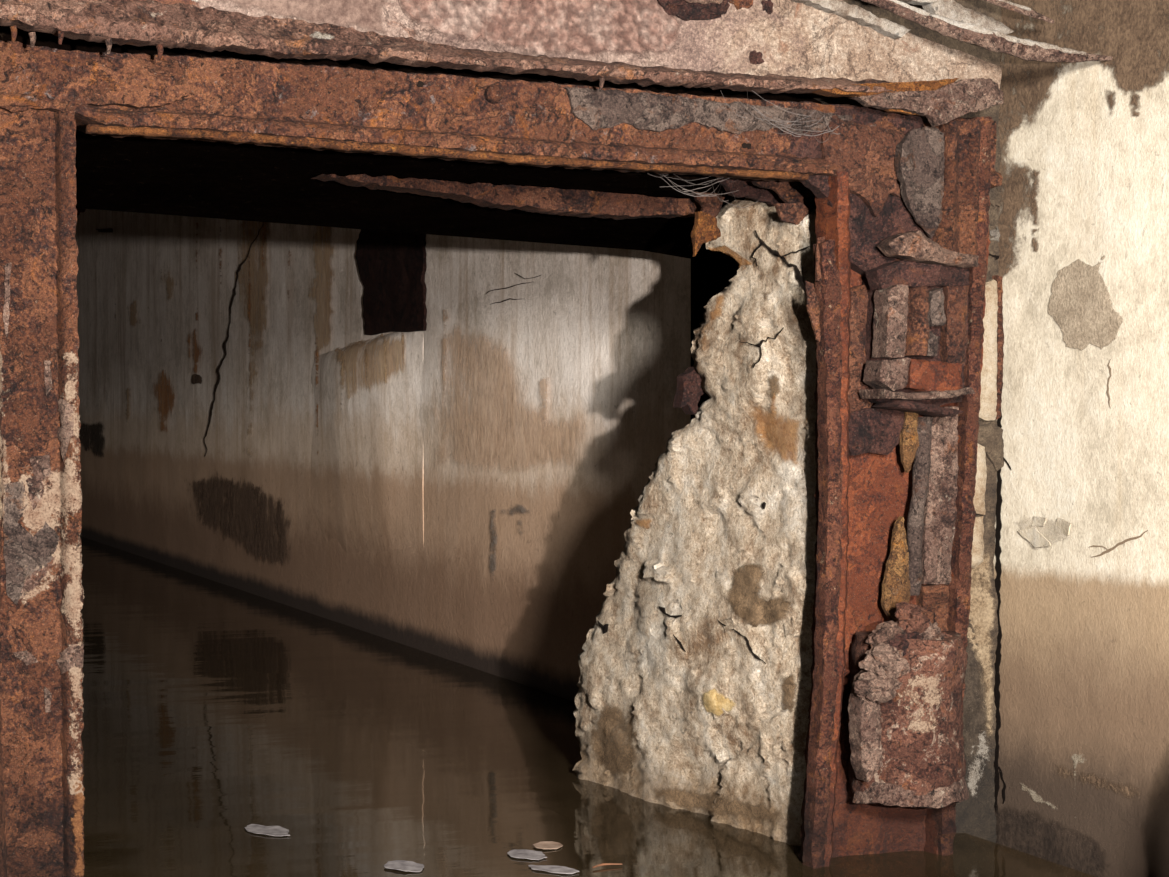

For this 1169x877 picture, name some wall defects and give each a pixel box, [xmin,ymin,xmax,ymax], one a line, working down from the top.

rust [10,26,36,48]
rust [311,174,814,268]
crack [204,224,264,457]
rust [235,221,269,394]
rust [310,226,404,398]
spalling [1048,256,1123,350]
rust [154,370,175,432]
rust [768,375,779,416]
peeling [1017,516,1072,549]
spalling [720,564,796,637]
spalling [703,689,736,719]
spalling [782,674,796,712]